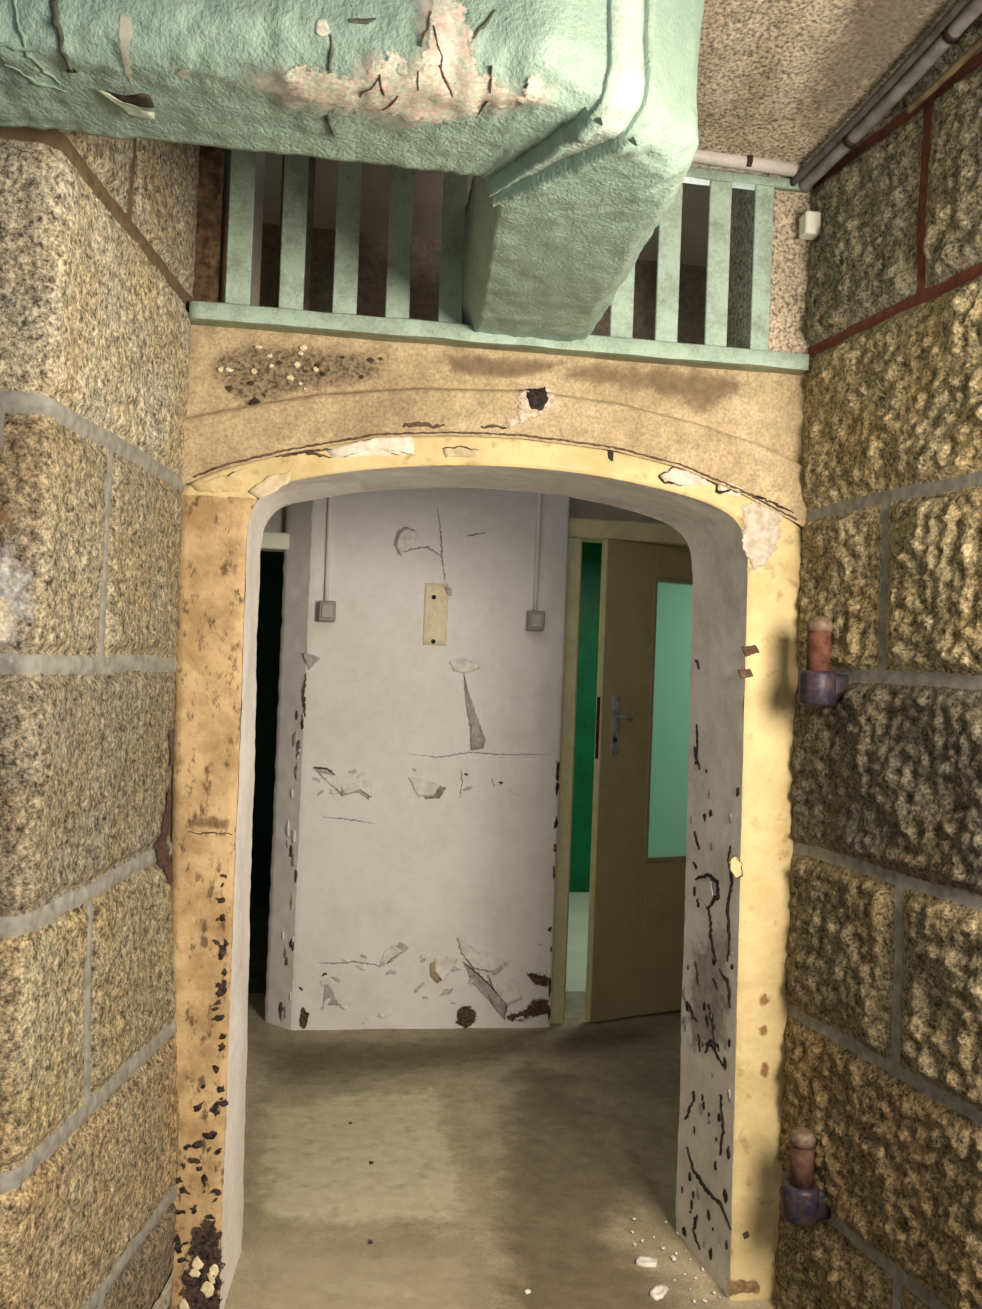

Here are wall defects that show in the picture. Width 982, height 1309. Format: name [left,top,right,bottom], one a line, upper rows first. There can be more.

crack [49,0,77,73]
peeling [254,0,548,124]
spalling [505,385,556,429]
peeling [327,437,415,458]
peeling [658,466,782,571]
peeling [408,768,446,799]
peeling [319,937,531,1025]
water stain [507,973,550,1022]
peeling [536,969,551,1021]
crack [681,724,740,1260]
water stain [250,1005,669,1309]